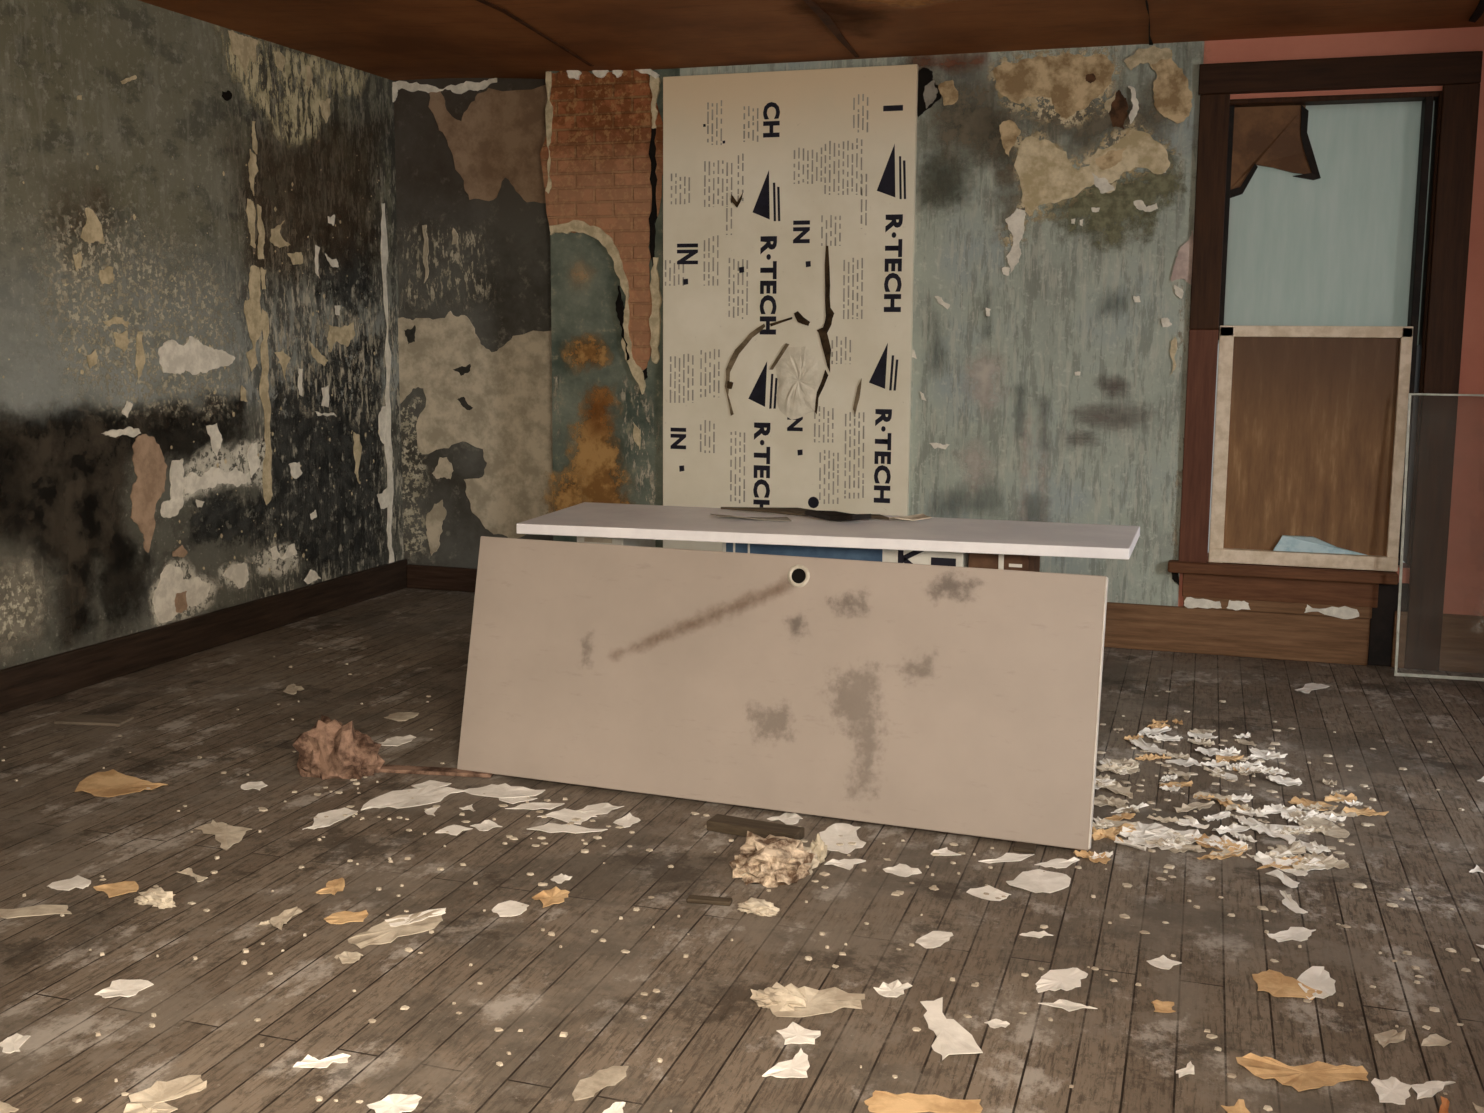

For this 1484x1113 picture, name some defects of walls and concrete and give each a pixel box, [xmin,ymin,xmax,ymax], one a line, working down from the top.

crack [1469,0,1484,23]
spalling [988,46,1193,276]
spalling [41,29,560,563]
spalling [392,69,663,505]
damp [147,402,244,460]
damp [333,347,361,459]
peeling [0,556,48,656]
damp [55,467,151,647]
damp [191,493,266,546]
peeling [149,544,321,627]